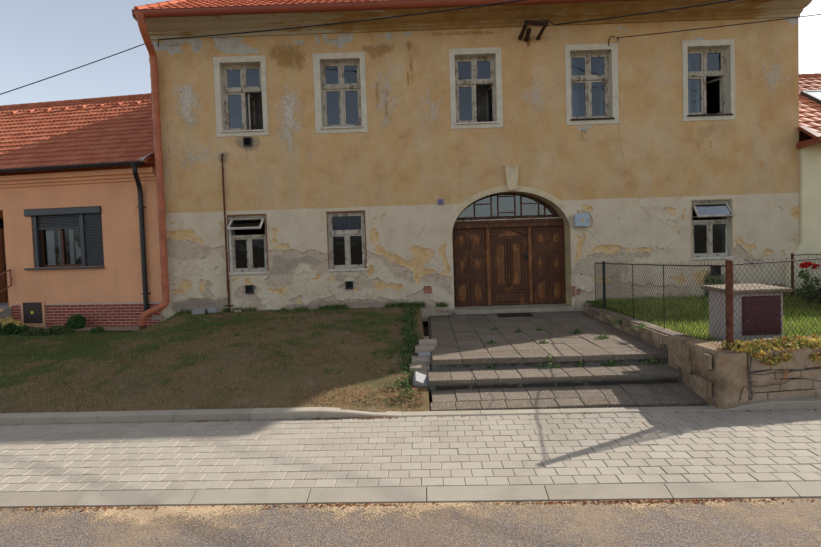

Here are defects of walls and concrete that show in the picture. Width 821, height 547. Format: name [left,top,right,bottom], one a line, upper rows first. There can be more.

spalling [170,278,216,312]
spalling [166,221,229,262]
spalling [234,213,454,313]
spalling [568,204,710,309]